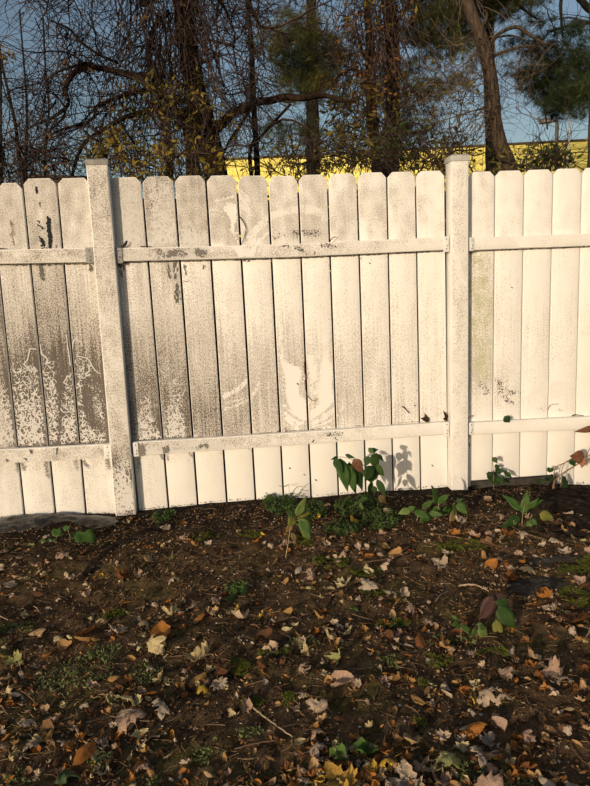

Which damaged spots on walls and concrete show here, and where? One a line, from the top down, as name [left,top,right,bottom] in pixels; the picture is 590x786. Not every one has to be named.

damp [0,161,590,518]